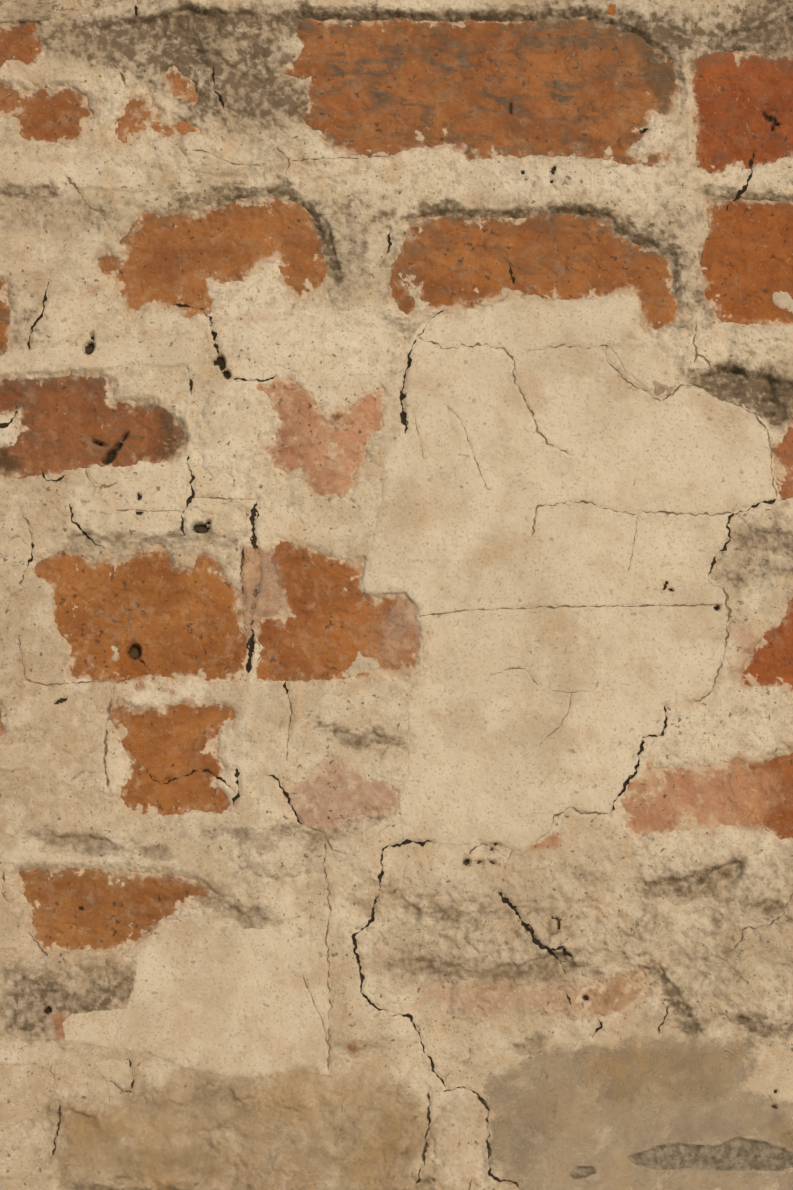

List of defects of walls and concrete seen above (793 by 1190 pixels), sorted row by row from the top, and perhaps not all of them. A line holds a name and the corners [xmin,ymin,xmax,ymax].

flaking render [284,16,793,183]
flaking render [97,193,329,318]
crack [174,303,275,382]
flaking render [390,212,678,333]
flaking render [0,374,185,479]
crack [42,456,263,681]
flaking render [34,541,419,683]
crack [399,310,778,858]
flaking render [19,867,218,952]
crack [269,681,519,1190]
crack [498,892,572,1004]
damp [484,1037,793,1190]